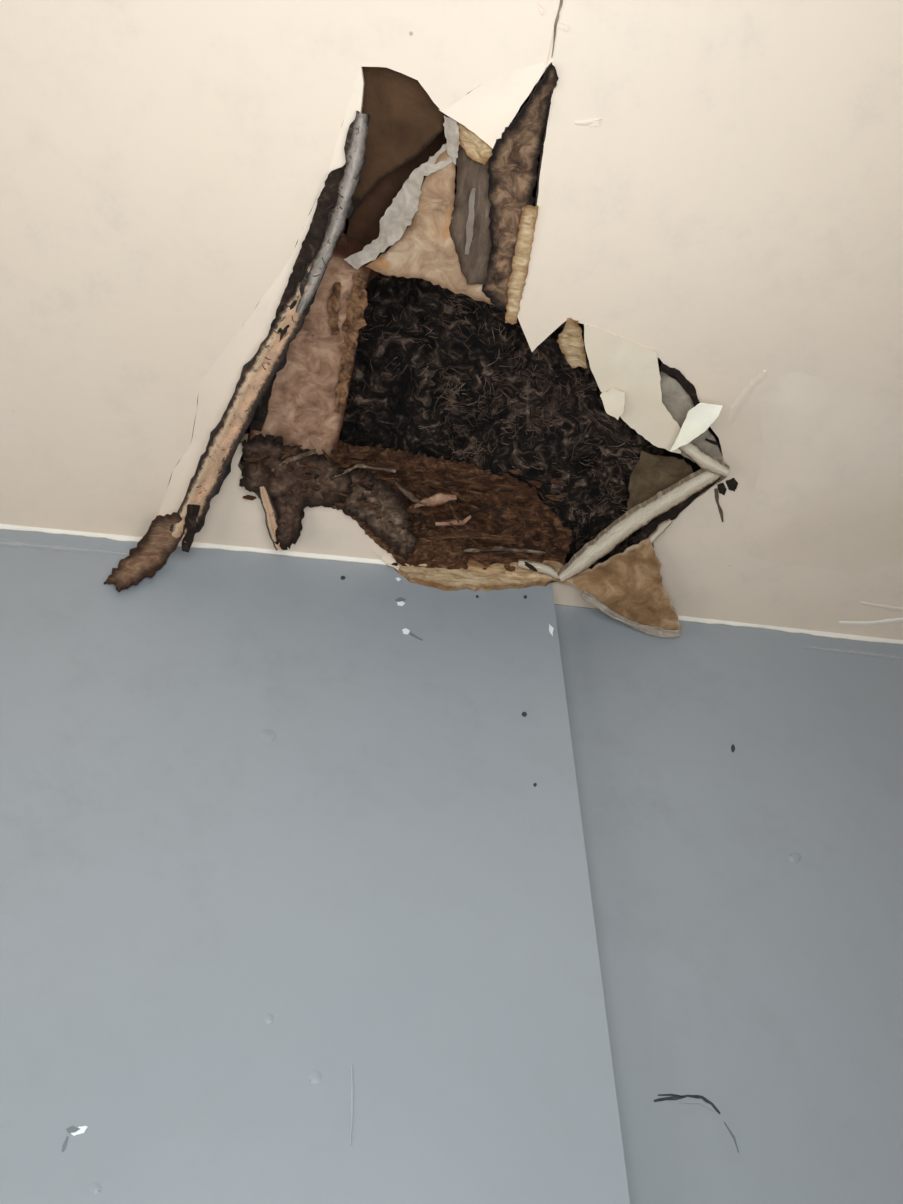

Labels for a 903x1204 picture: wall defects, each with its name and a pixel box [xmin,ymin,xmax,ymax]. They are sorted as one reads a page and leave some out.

crack [537,0,569,66]
peeling [584,324,681,454]
spalling [557,459,738,582]
crack [654,1094,739,1153]